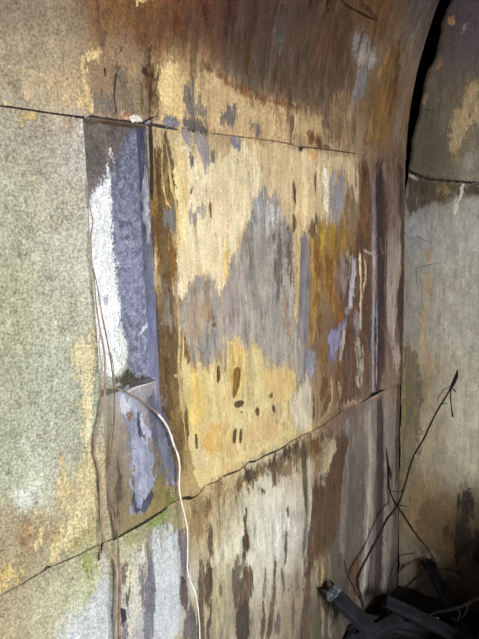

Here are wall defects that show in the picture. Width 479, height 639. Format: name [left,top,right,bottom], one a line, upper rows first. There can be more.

crack [1,47,357,154]
corrosion [307,113,343,150]
corrosion [363,33,405,157]
crack [408,169,479,185]
corrosion [153,131,191,474]
crack [360,389,386,403]
crack [0,412,341,596]
water stain [301,443,312,556]
water stain [338,449,349,559]
water stain [232,507,254,639]
water stain [260,531,300,639]
water stain [326,584,342,602]